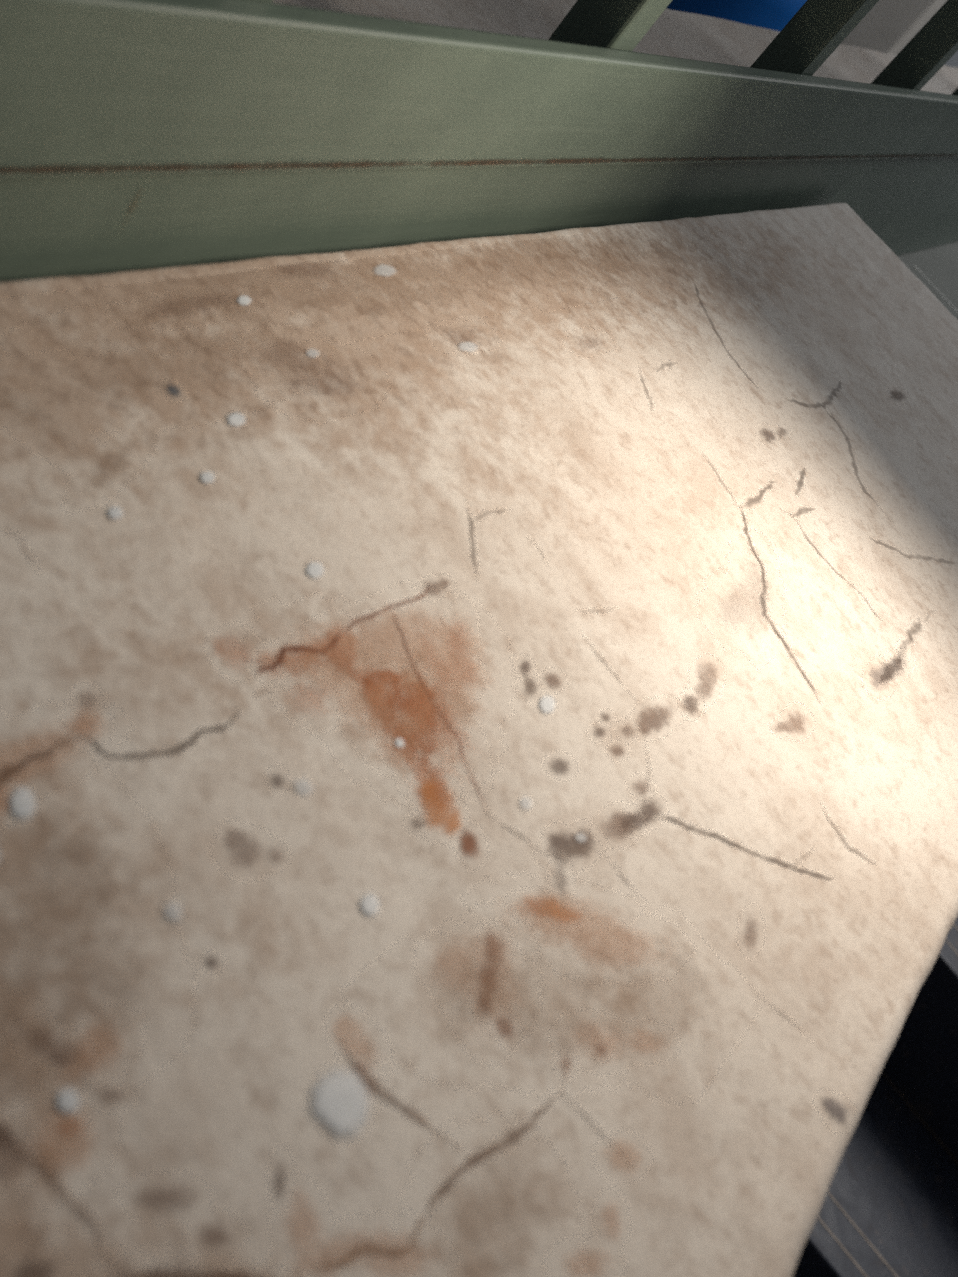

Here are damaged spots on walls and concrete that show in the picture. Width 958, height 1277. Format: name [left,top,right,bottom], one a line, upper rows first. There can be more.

crack [743,515,813,688]
crack [259,637,338,673]
crack [0,719,234,782]
corrosion [423,782,477,853]
damp [551,832,591,858]
damp [628,804,658,828]
crack [672,818,828,879]
crack [432,1109,545,1202]
crack [188,1269,249,1277]